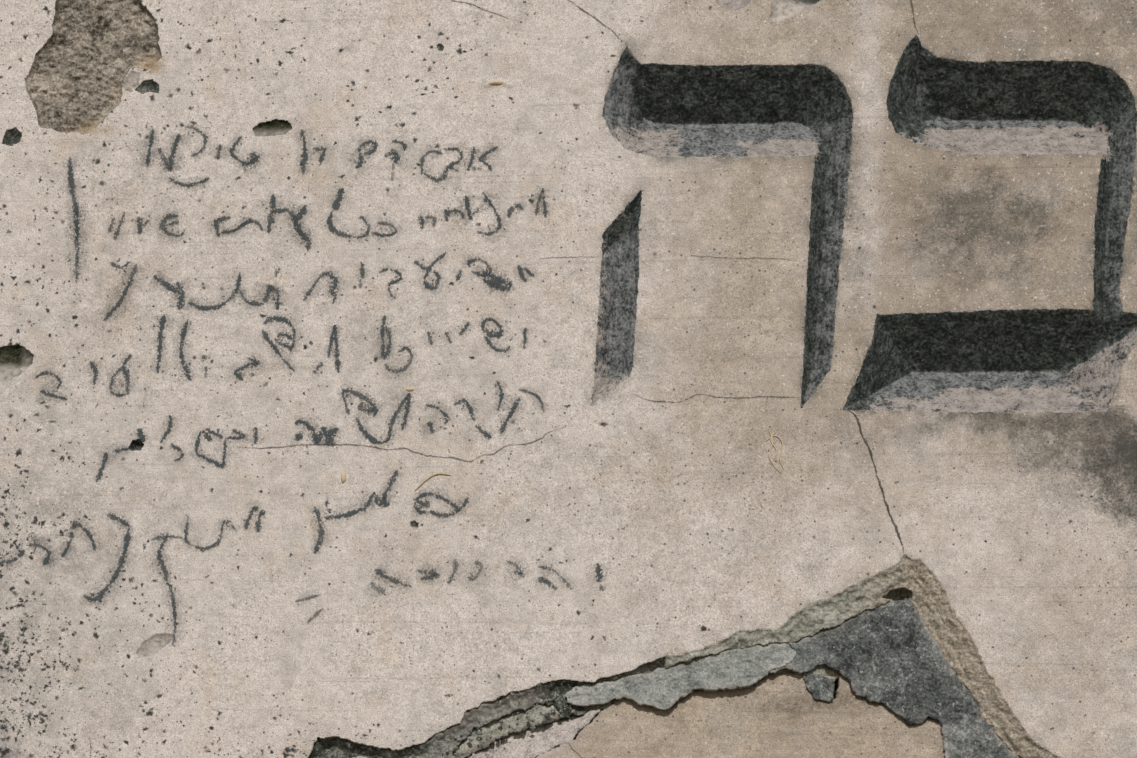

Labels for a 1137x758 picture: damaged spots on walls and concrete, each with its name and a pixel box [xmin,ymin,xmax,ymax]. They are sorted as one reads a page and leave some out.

spalling [24,0,162,135]
water stain [177,9,305,80]
water stain [406,23,495,98]
spalling [770,0,821,25]
water stain [981,411,1137,511]
water stain [0,449,192,758]
peeling [135,633,174,658]
crack [309,410,1059,758]